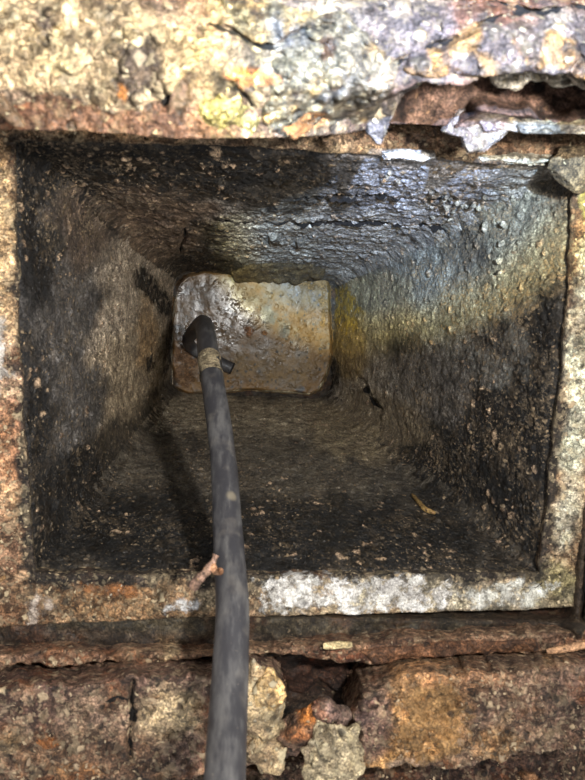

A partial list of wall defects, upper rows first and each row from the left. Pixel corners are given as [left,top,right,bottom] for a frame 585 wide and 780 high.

crack [209,23,286,56]
crack [397,22,454,65]
crack [466,0,585,39]
crack [233,84,254,107]
spalling [366,71,585,166]
spalling [274,654,352,695]
crack [105,679,138,756]
corrosion [276,695,352,758]